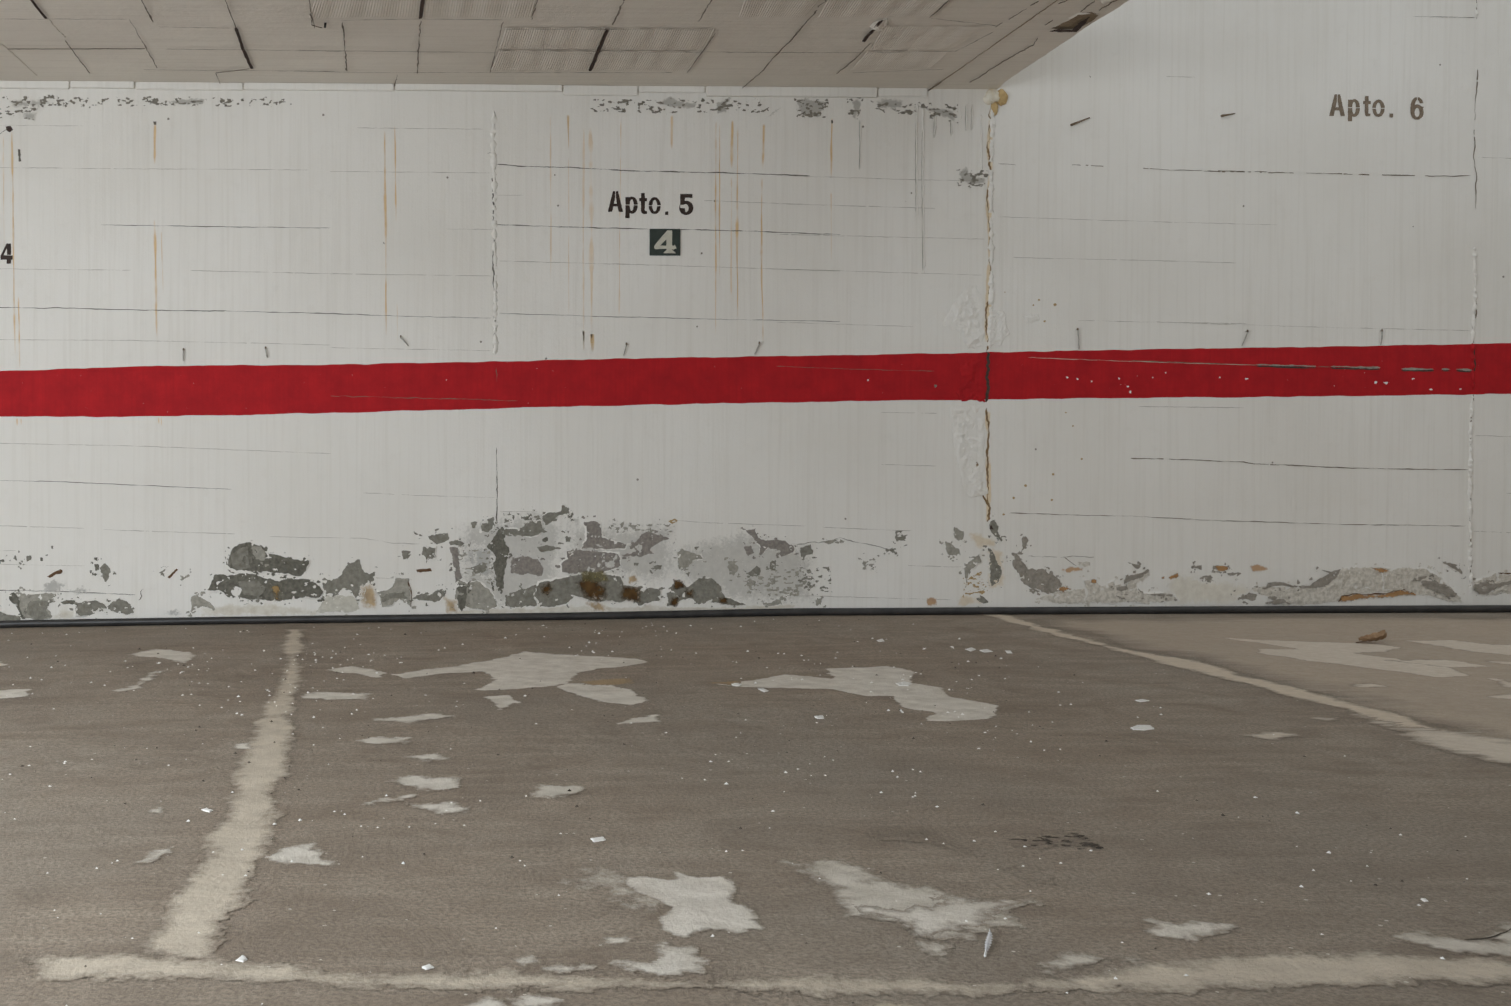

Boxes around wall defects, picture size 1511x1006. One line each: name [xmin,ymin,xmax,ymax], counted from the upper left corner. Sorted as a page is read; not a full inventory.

crack [589,0,625,71]
crack [687,0,715,73]
crack [743,0,826,88]
crack [836,18,889,74]
crack [915,0,1384,525]
peeling [0,546,135,621]
spalling [153,498,907,617]
spalling [939,513,1511,607]
crack [1465,929,1511,940]